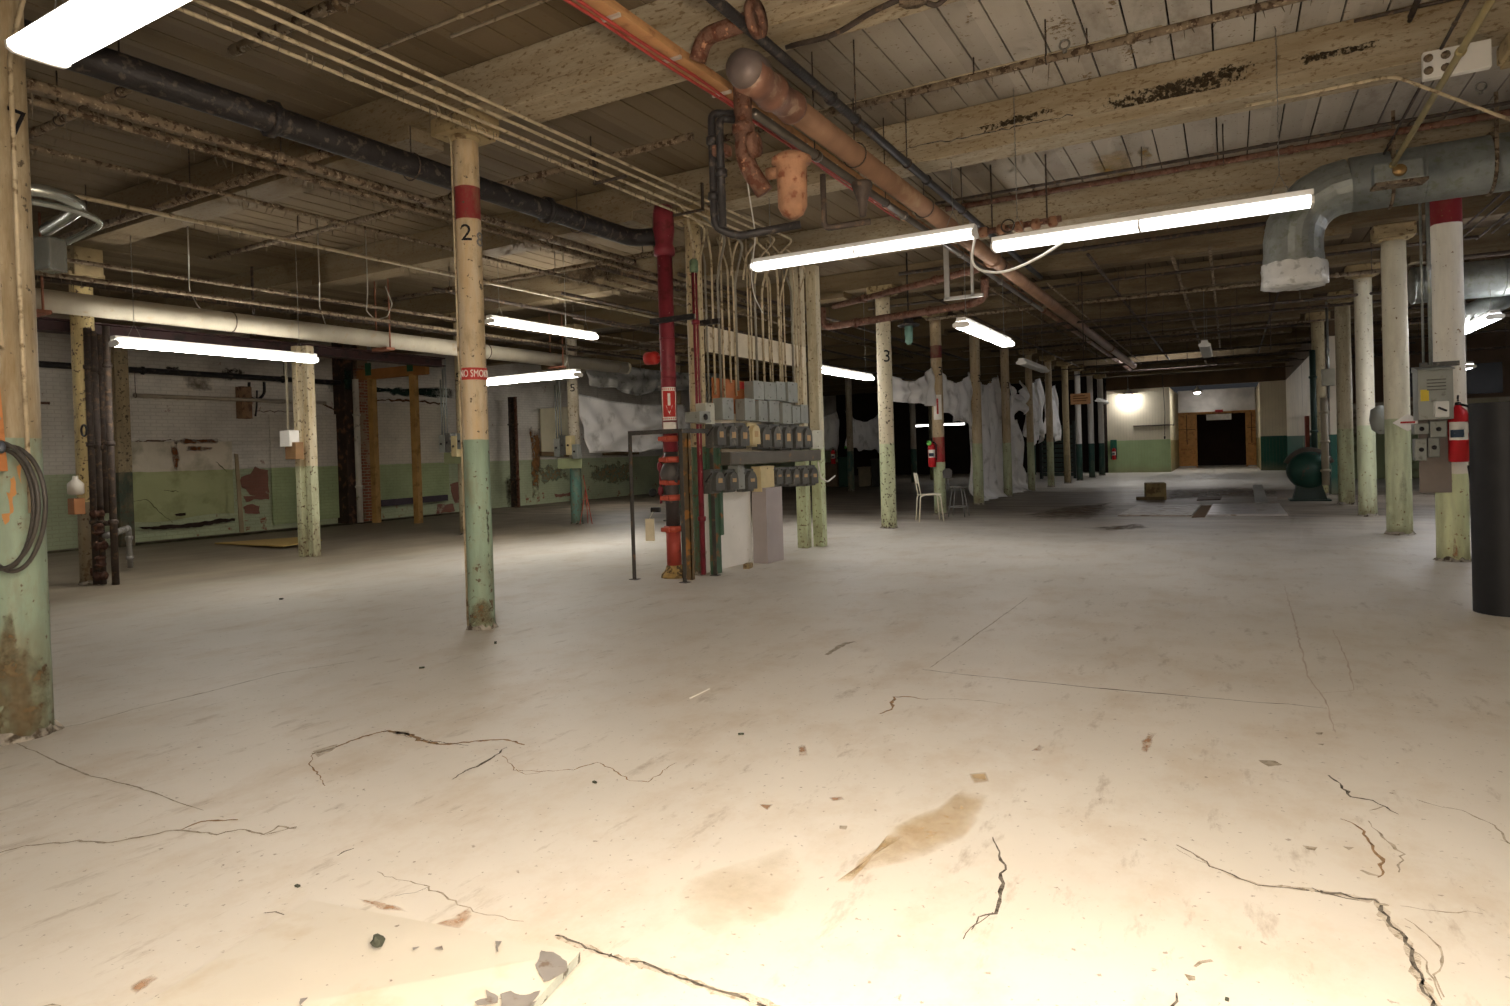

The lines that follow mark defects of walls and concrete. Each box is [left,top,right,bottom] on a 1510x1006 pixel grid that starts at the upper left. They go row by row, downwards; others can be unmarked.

damp [1299,40,1381,65]
damp [1103,61,1258,109]
damp [980,109,1052,133]
flaking render [240,467,270,514]
crack [825,641,855,655]
crack [880,586,1354,732]
crack [0,661,353,853]
crack [308,730,675,786]
crack [963,837,1007,939]
crack [1170,775,1510,1006]
crack [337,848,779,1006]